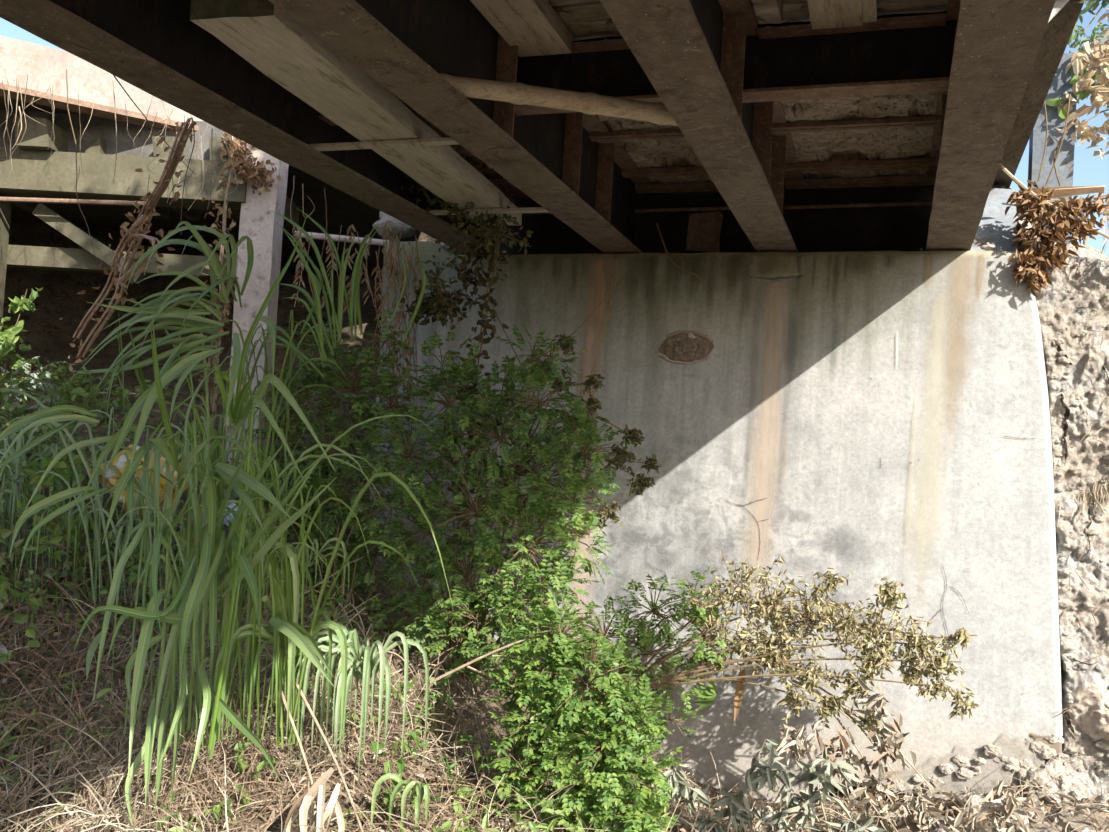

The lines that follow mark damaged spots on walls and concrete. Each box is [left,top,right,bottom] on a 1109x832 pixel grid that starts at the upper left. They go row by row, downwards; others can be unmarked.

spalling [657,330,715,365]
crack [931,565,969,655]